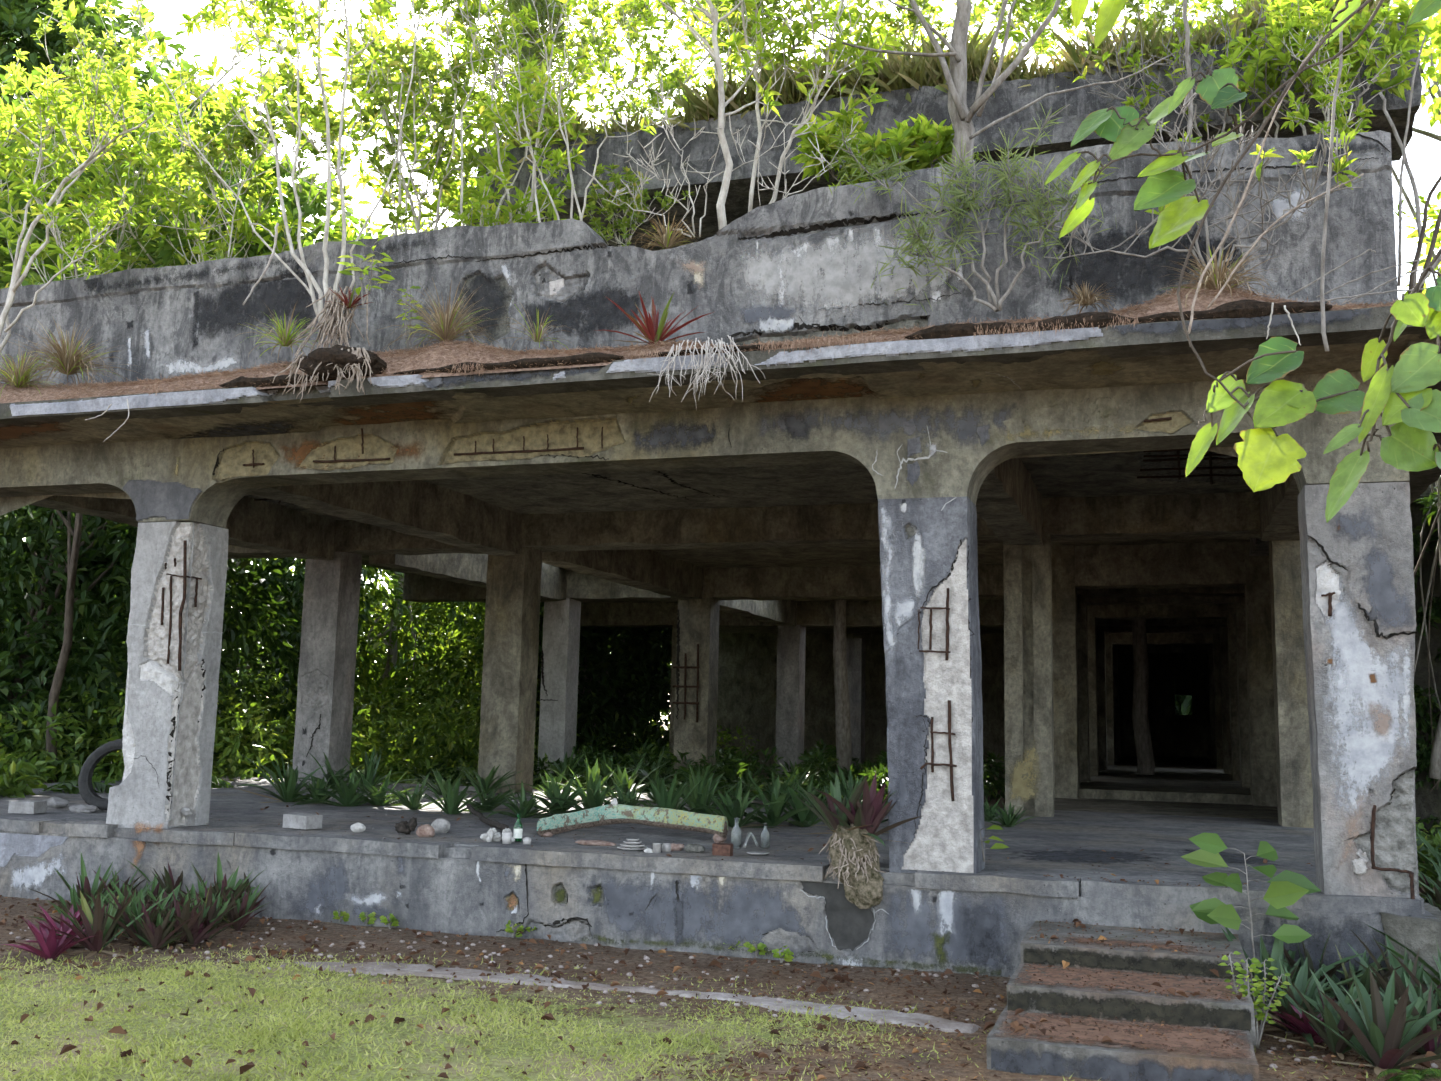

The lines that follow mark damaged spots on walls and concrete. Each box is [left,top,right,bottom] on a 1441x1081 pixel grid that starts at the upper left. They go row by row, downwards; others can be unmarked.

spalling [532,264,590,304]
spalling [297,428,399,471]
crack [872,427,947,488]
spalling [122,441,280,826]
crack [922,539,974,676]
crack [913,719,929,835]
spalling [886,539,974,873]
peeling [1307,535,1441,990]
crack [496,864,592,943]